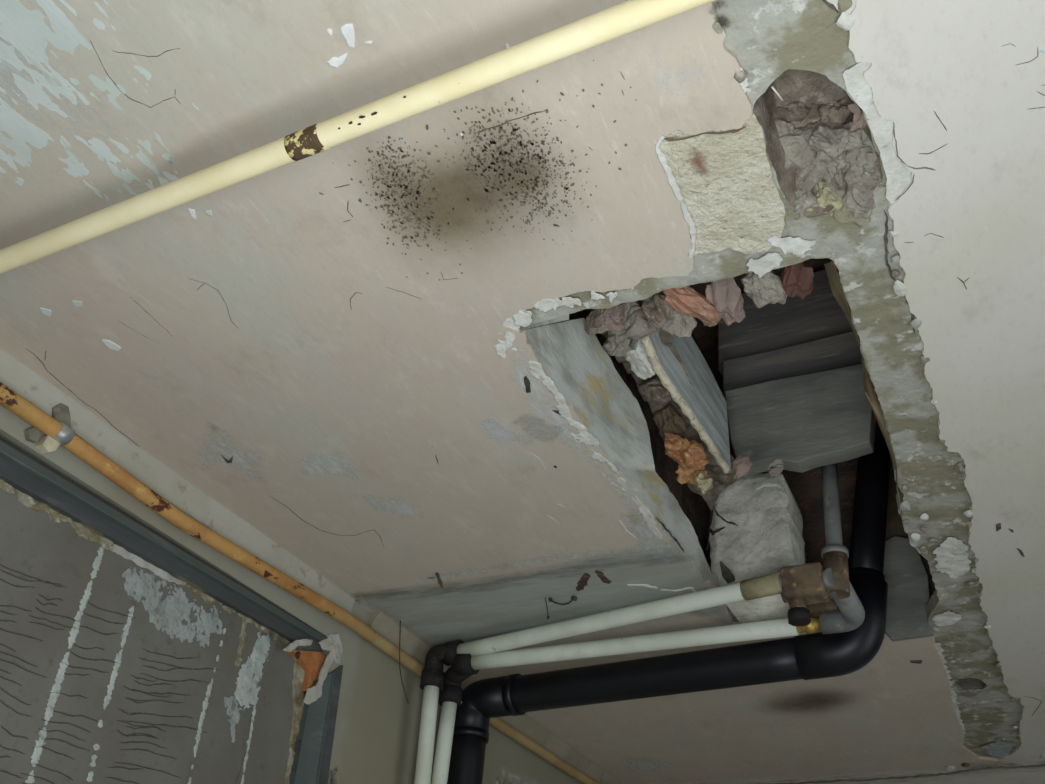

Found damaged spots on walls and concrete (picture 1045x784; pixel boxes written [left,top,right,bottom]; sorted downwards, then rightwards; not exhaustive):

peeling [0,0,178,206]
crack [90,41,180,108]
damp [348,90,597,274]
spalling [494,0,1023,758]